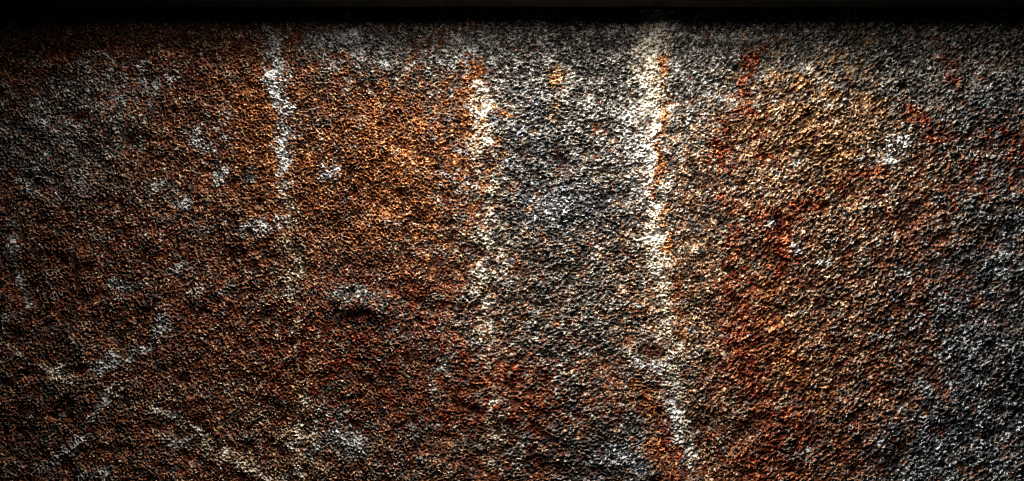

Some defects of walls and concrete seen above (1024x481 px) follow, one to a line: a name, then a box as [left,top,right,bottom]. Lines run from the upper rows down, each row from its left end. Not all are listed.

leakage [237,26,325,481]
leakage [317,164,341,188]
rust [200,36,559,443]
leakage [429,14,513,470]
leakage [613,9,700,481]
rust [645,17,957,481]
rust [928,46,1024,202]